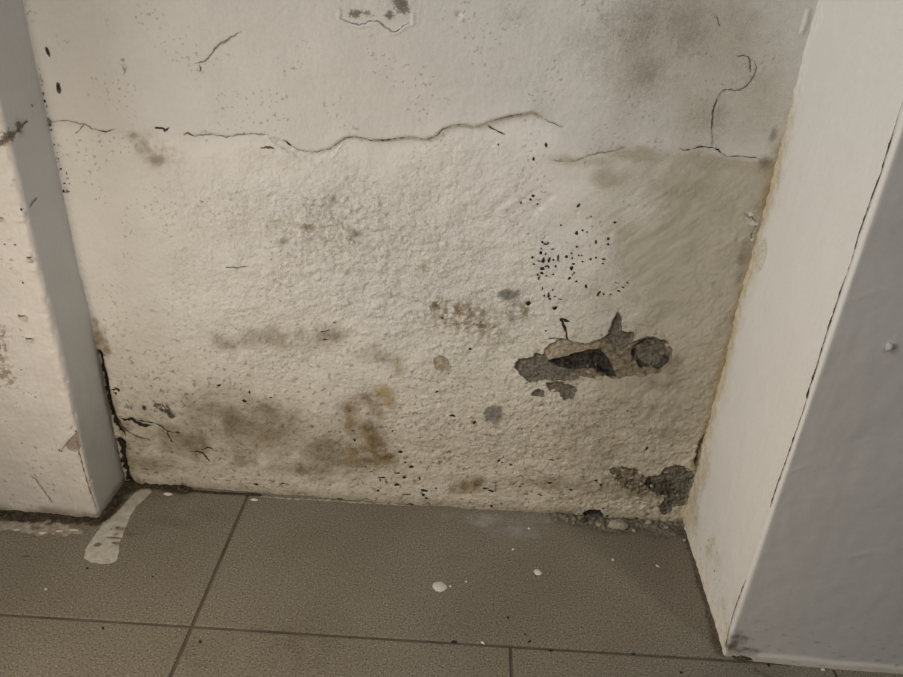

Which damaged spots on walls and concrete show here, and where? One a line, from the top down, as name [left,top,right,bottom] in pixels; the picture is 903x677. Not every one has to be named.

peeling [336,0,416,37]
crack [194,32,240,71]
crack [0,104,33,146]
crack [155,112,563,153]
crack [555,147,625,162]
crack [679,55,757,158]
leakage [531,241,606,322]
leakage [597,129,786,522]
flaking render [514,312,674,400]
crack [99,350,174,480]
flaking render [610,463,694,519]